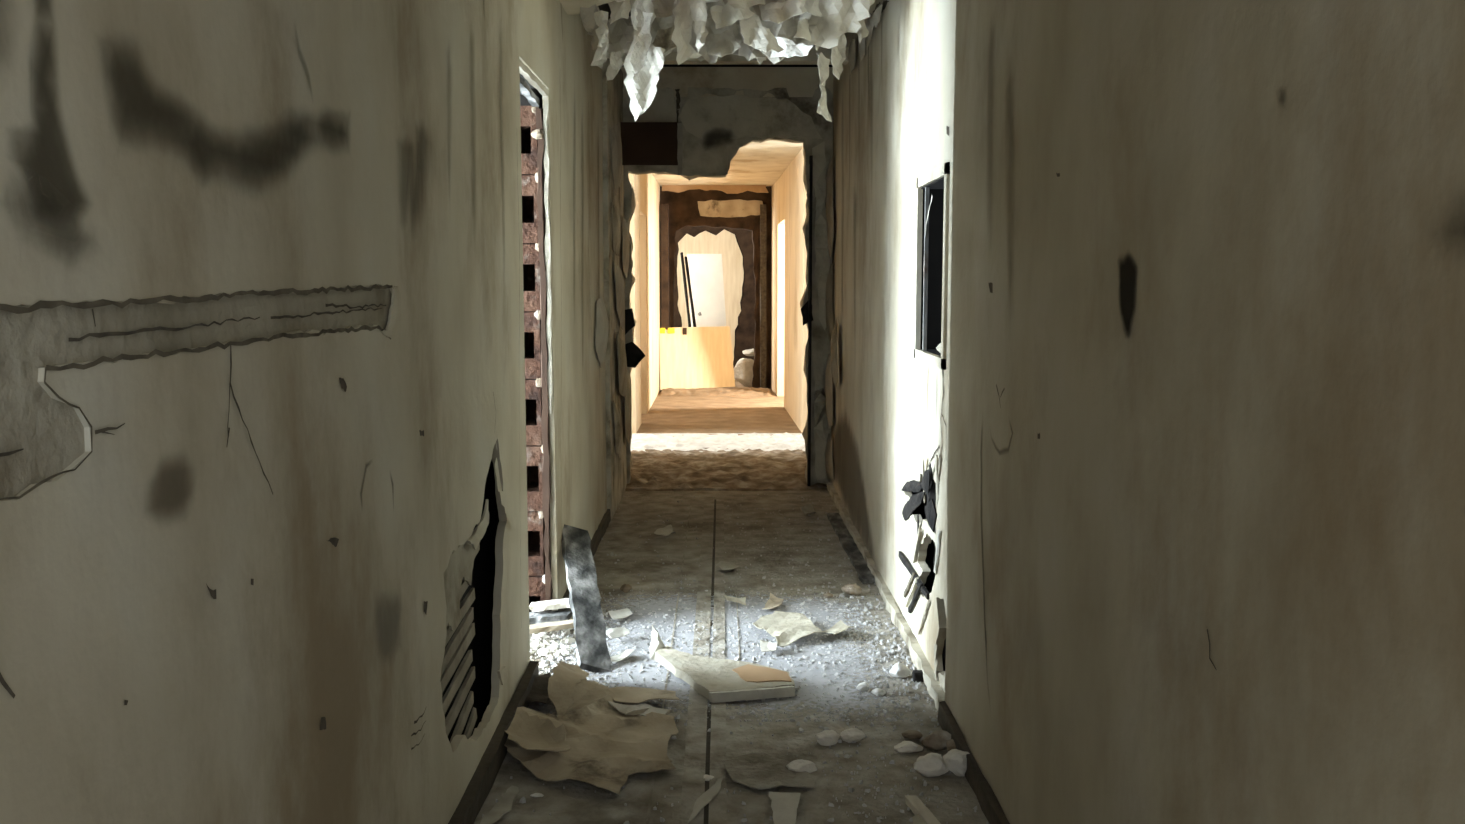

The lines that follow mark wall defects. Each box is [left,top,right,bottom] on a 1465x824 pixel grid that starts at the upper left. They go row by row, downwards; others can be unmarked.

leakage [22,32,84,217]
leakage [111,54,347,180]
peeling [848,0,889,74]
spalling [610,87,839,483]
spalling [0,284,400,500]
spalling [424,421,516,743]
spalling [899,455,941,635]
spalling [934,638,946,681]